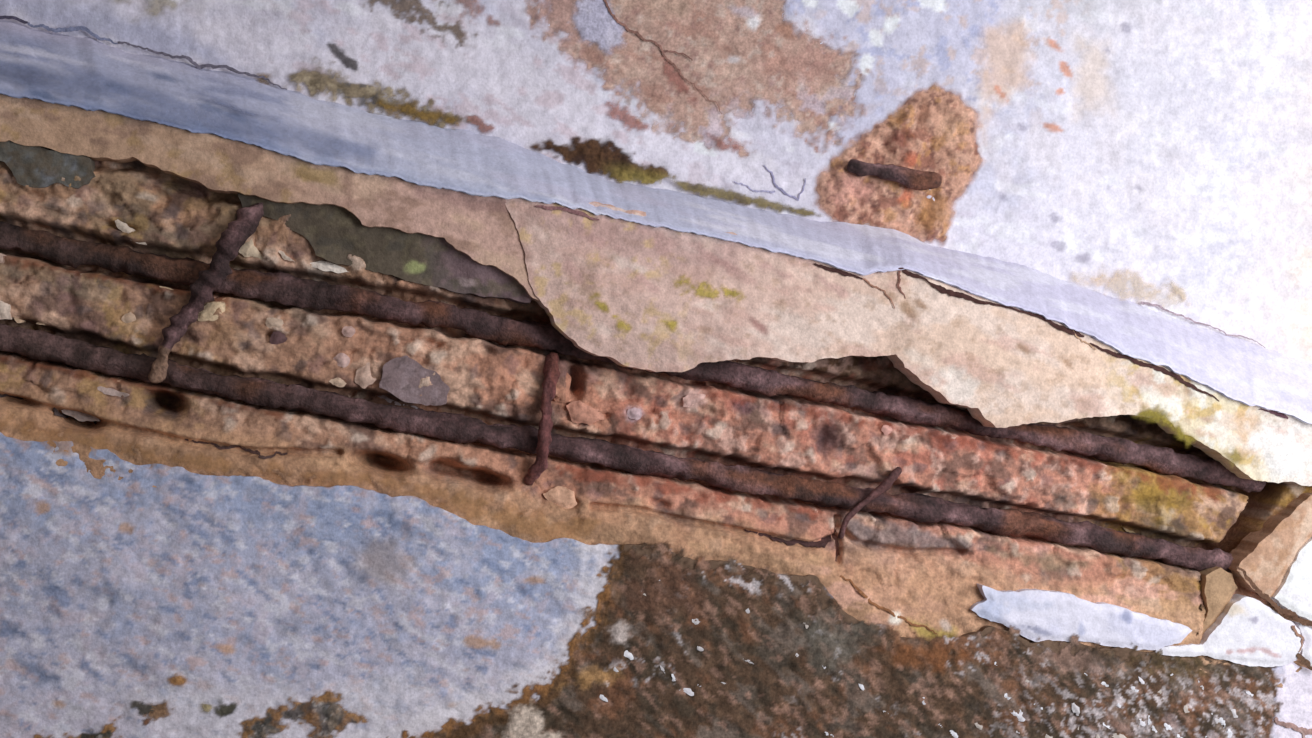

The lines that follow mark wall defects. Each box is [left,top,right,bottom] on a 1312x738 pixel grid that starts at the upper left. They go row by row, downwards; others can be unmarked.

crack [604,0,722,114]
peeling [527,0,983,242]
spalling [0,141,551,324]
spalling [0,248,1312,553]
spalling [0,351,1231,673]
damp [34,720,116,738]
damp [131,701,170,725]
damp [169,674,186,685]
damp [202,691,367,738]
damp [387,542,1285,738]
spalling [1233,580,1310,626]